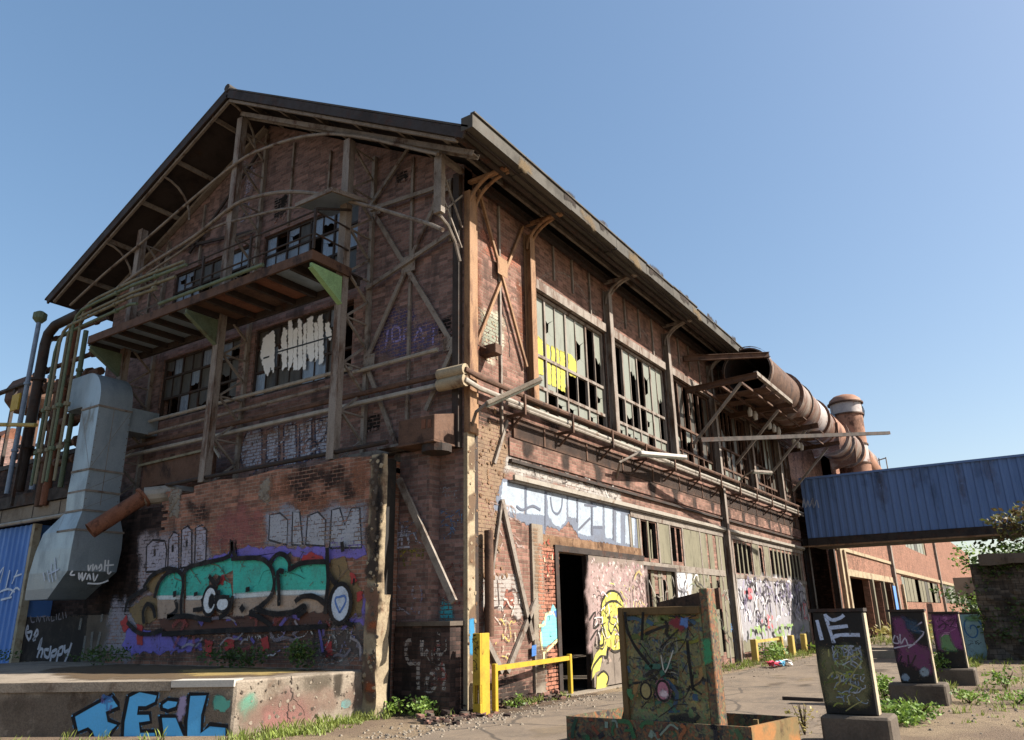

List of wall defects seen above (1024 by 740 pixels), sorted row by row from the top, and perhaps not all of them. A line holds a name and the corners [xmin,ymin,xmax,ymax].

peeling [235,456,384,725]